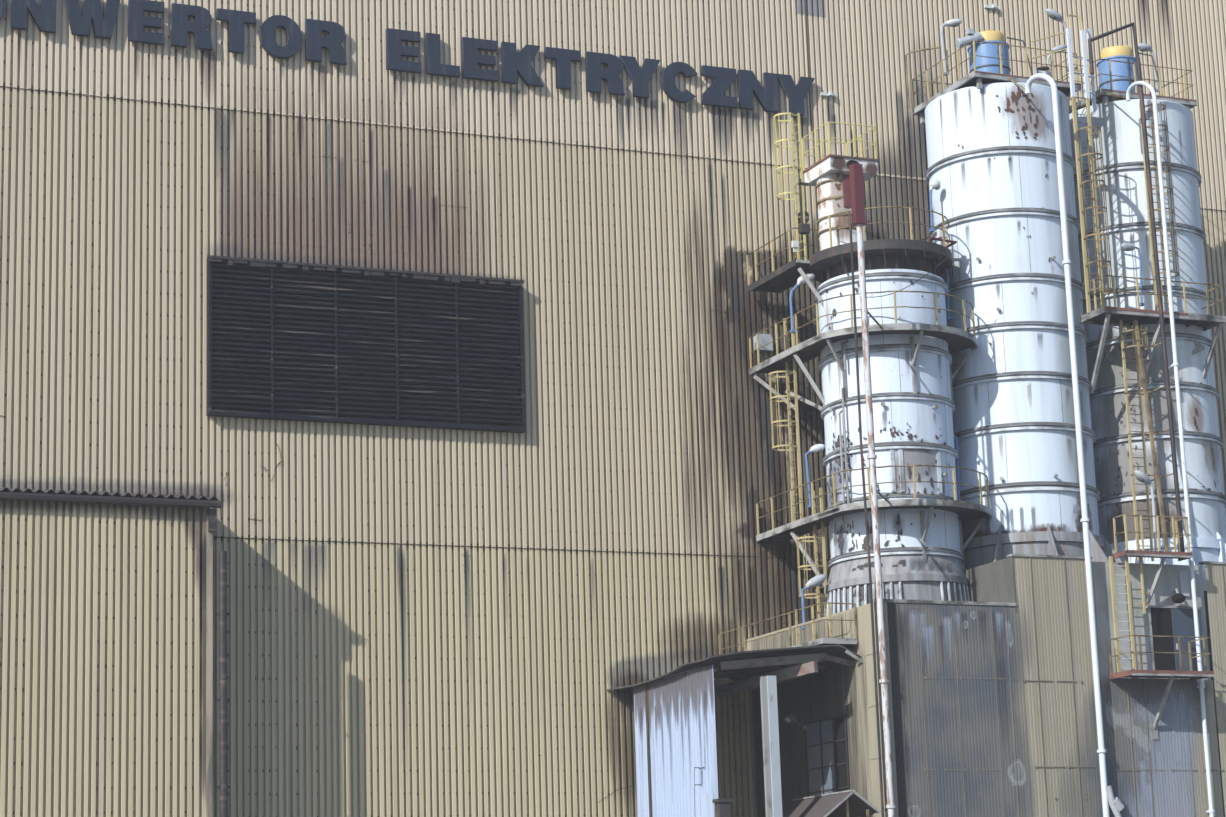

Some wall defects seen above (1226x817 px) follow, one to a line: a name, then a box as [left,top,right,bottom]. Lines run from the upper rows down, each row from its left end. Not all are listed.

corrosion [996,87,1041,139]
corrosion [832,157,849,170]
corrosion [891,430,946,495]
leakage [910,614,960,642]